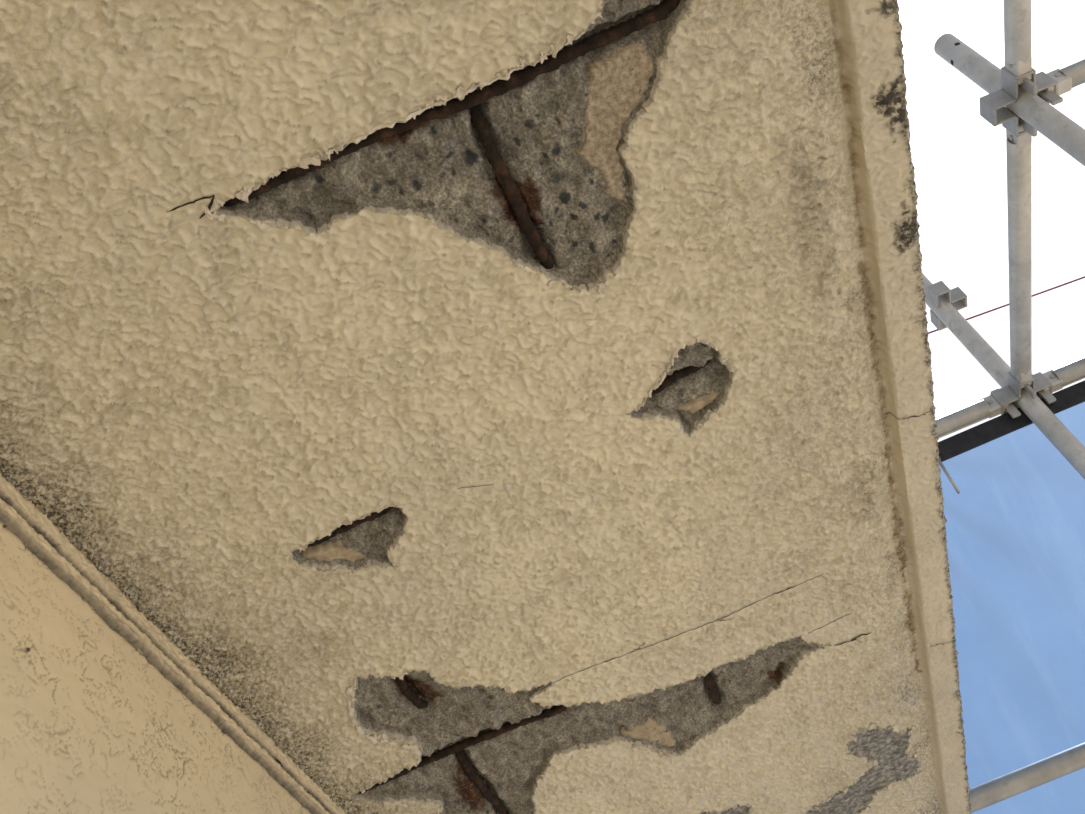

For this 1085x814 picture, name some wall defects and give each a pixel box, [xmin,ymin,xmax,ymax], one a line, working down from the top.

spalling [205,0,694,294]
rust [494,175,544,226]
spalling [626,336,737,438]
spalling [285,503,409,575]
rust [401,674,441,700]
rust [455,755,489,811]
spalling [345,635,833,814]
peeling [802,724,922,814]